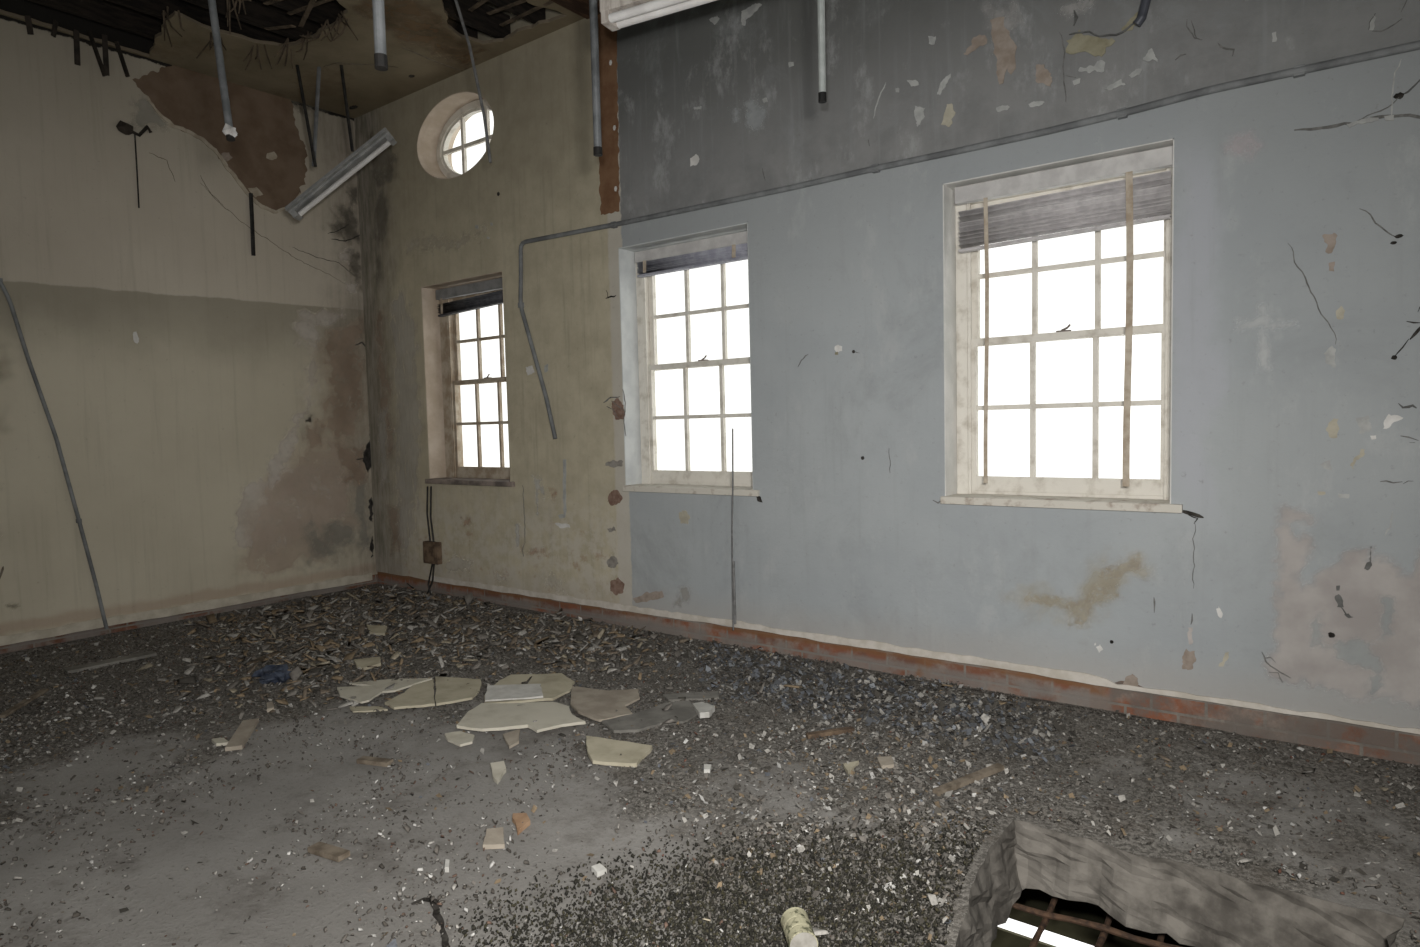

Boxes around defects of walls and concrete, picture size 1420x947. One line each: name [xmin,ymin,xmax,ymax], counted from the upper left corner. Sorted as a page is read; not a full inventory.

flaking render [132,65,308,214]
peeling [937,74,956,127]
peeling [964,17,1017,84]
peeling [1066,12,1158,91]
crack [1294,0,1420,131]
water stain [372,147,394,242]
crack [1290,246,1337,345]
crack [1396,307,1420,355]
water stain [307,312,394,564]
spalling [1335,586,1352,618]
crack [411,894,450,947]